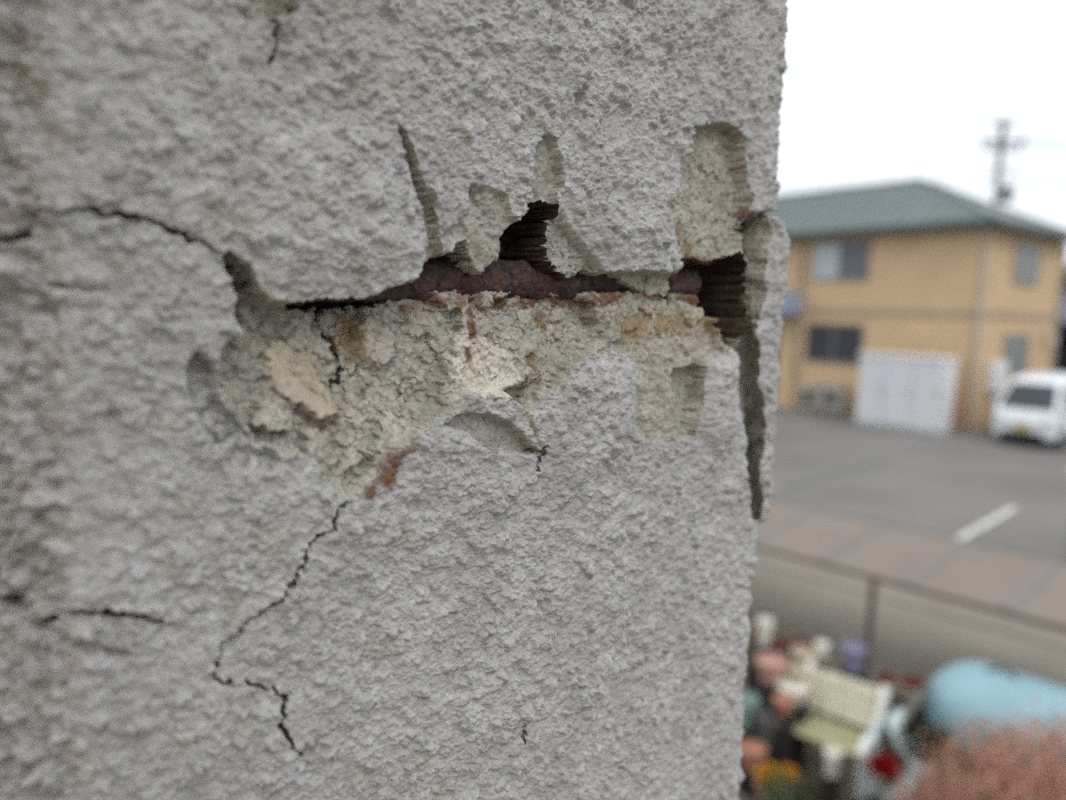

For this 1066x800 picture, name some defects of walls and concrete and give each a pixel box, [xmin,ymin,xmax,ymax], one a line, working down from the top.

crack [0,205,221,253]
spalling [184,120,779,501]
corrosion [356,258,721,340]